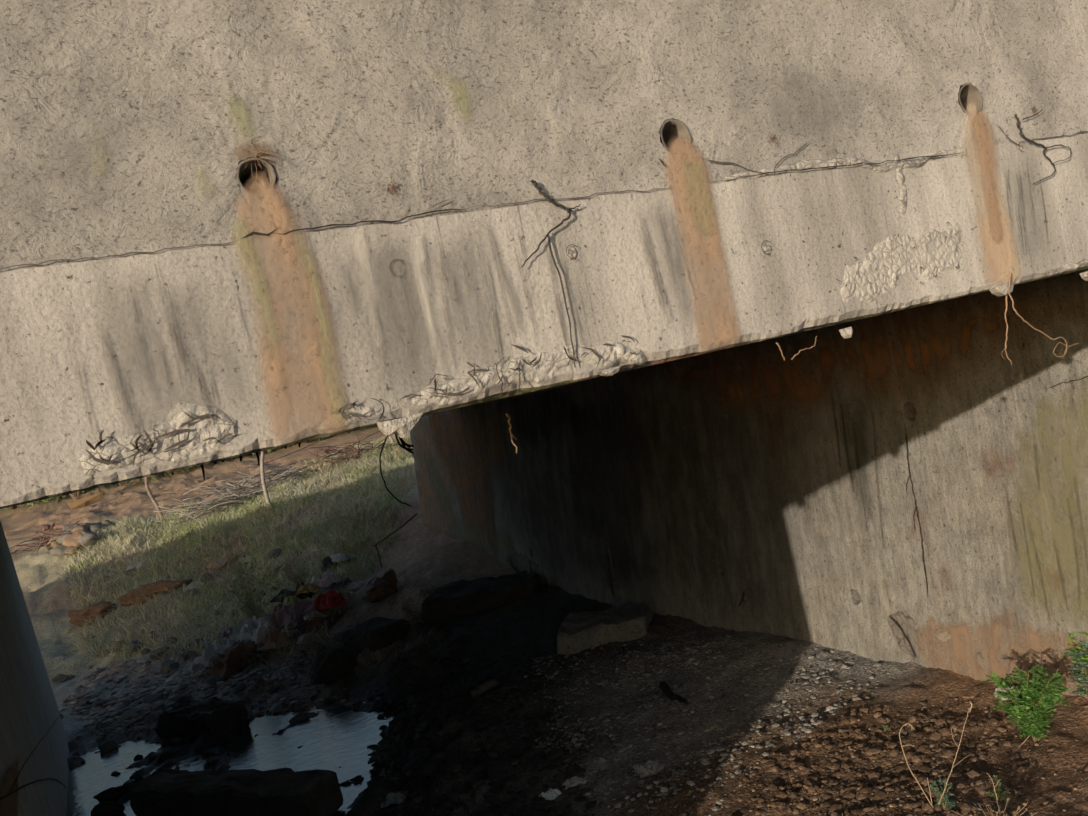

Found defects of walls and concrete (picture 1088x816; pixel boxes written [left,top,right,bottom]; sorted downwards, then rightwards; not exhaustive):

crack [0,159,668,270]
crack [706,159,768,183]
crack [998,126,1088,146]
spalling [78,400,263,480]
spalling [281,335,643,449]
crack [904,424,928,595]